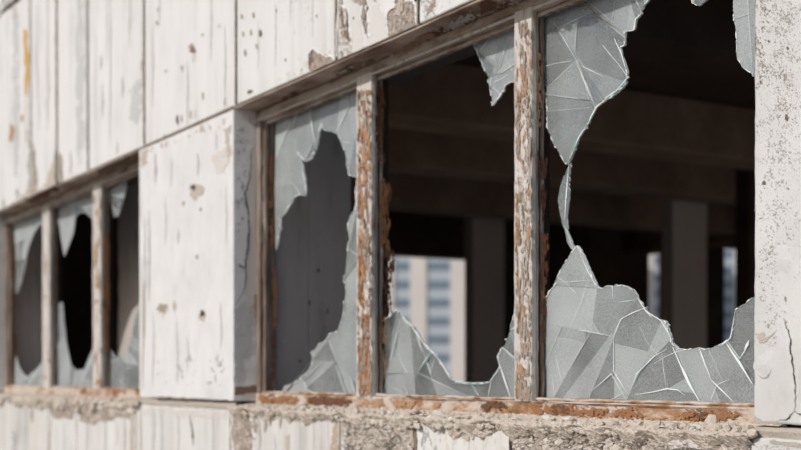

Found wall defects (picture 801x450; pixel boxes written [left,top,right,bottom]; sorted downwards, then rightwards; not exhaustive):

peeling [307,0,379,71]
peeling [386,0,438,36]
rust [385,0,518,59]
crack [235,147,253,305]
rust [459,20,751,430]
rust [254,85,449,450]
crack [776,318,801,422]
spalling [49,404,133,425]
spalling [293,408,427,450]
spalling [442,415,502,441]
spalling [512,415,752,450]